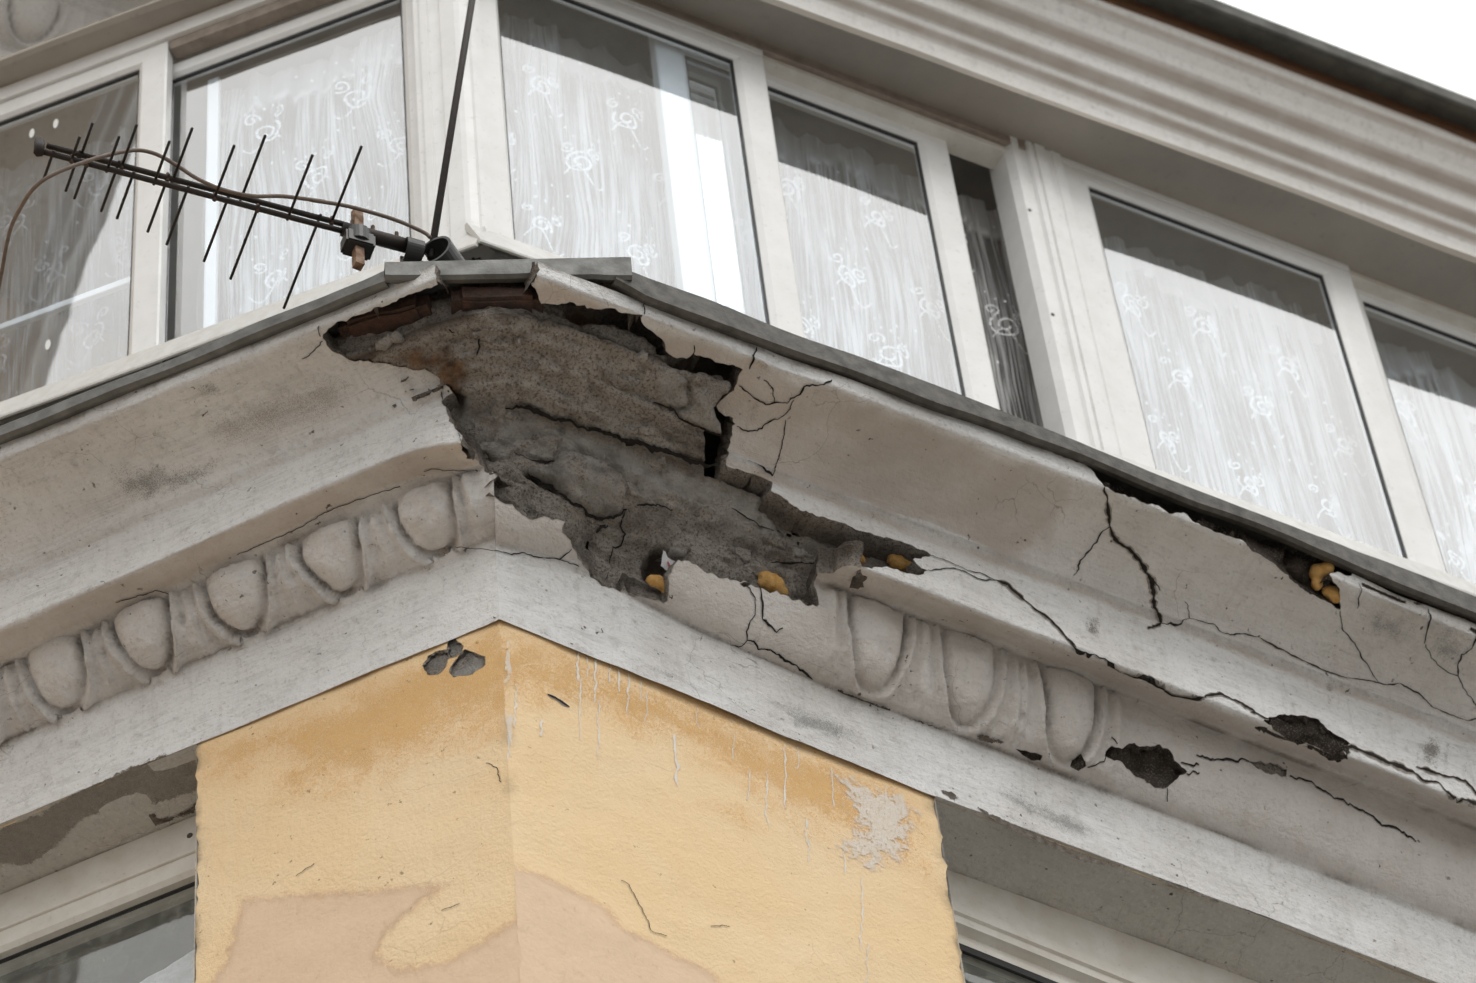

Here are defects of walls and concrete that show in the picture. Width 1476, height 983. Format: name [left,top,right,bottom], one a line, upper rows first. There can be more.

spalling [323,261,931,607]
crack [737,347,832,476]
spalling [422,638,486,678]
crack [732,583,813,680]
crack [929,555,1269,720]
crack [1074,487,1476,721]
peeling [0,753,197,866]
spalling [1070,754,1086,771]
spalling [1105,743,1187,789]
spalling [1255,714,1350,763]
crack [1290,775,1416,842]
crack [1345,743,1476,808]